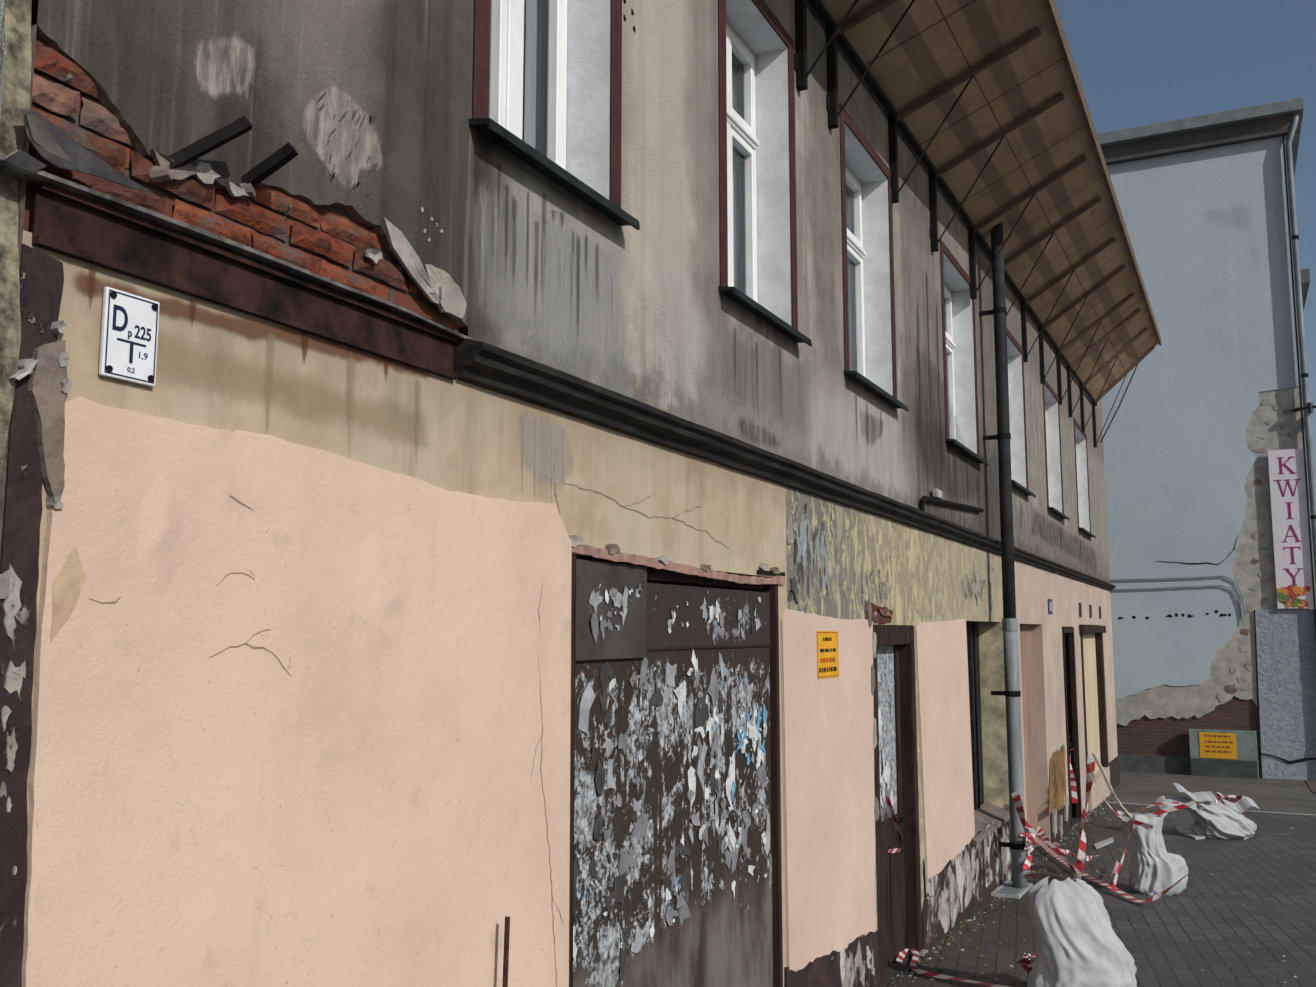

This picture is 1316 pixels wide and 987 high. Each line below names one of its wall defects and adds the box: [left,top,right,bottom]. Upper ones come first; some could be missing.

spalling [28,40,467,319]
damp [578,236,598,318]
crack [542,448,730,549]
peeling [962,553,994,612]
spalling [1115,386,1316,726]
peeling [0,564,30,813]
peeling [925,821,1012,934]
peeling [840,941,876,987]